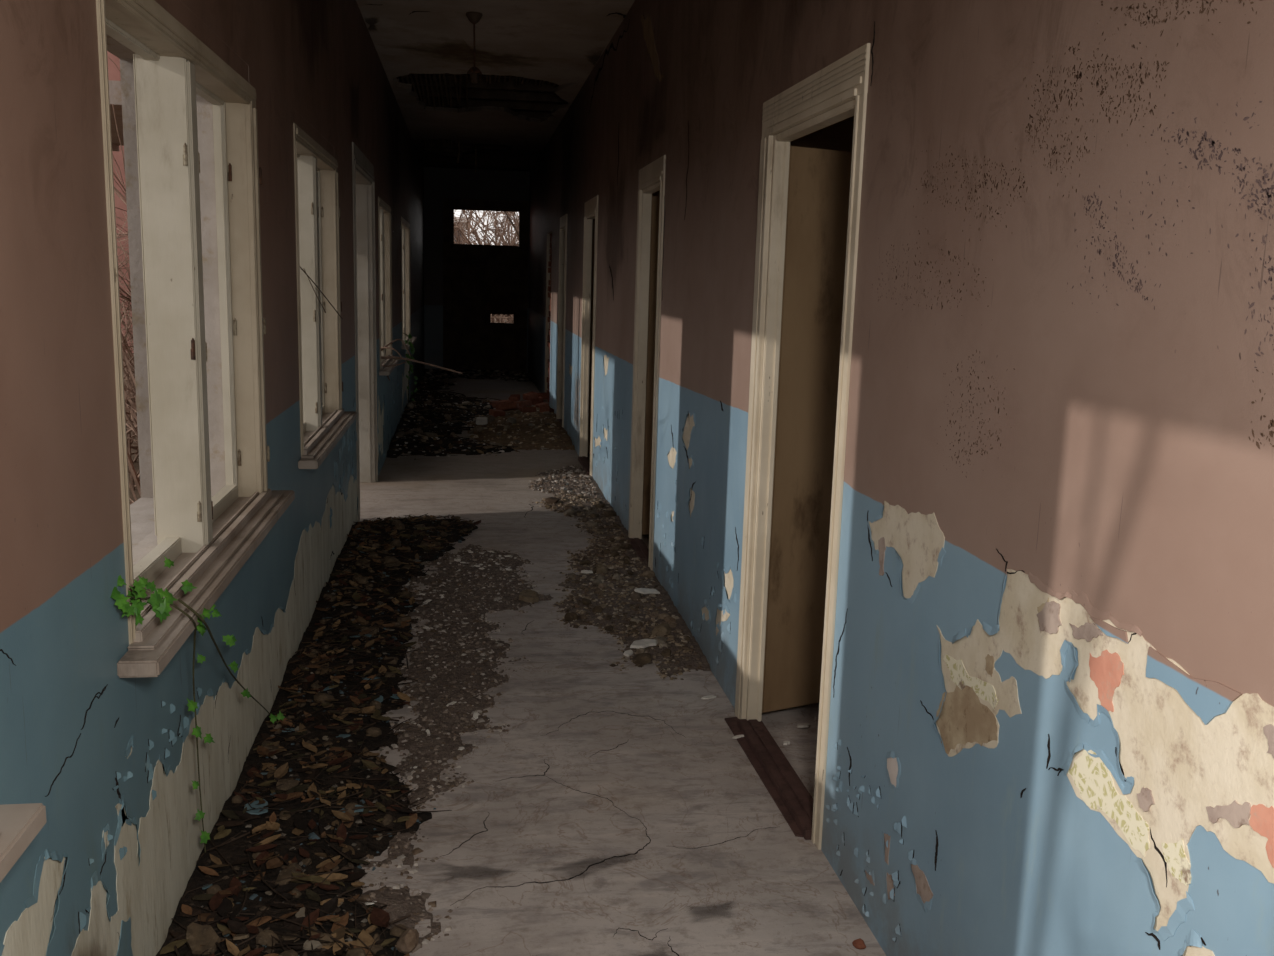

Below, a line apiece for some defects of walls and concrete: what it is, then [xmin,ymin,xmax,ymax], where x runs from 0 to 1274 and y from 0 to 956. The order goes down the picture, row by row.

damp [913,0,1274,449]
peeling [653,411,696,588]
peeling [690,562,737,664]
peeling [867,500,946,604]
peeling [0,849,68,956]
crack [45,684,108,797]
peeling [71,473,359,956]
crack [440,812,489,857]
crack [450,711,776,906]
crack [613,928,679,956]
peeling [825,739,933,917]
peeling [920,549,1274,956]